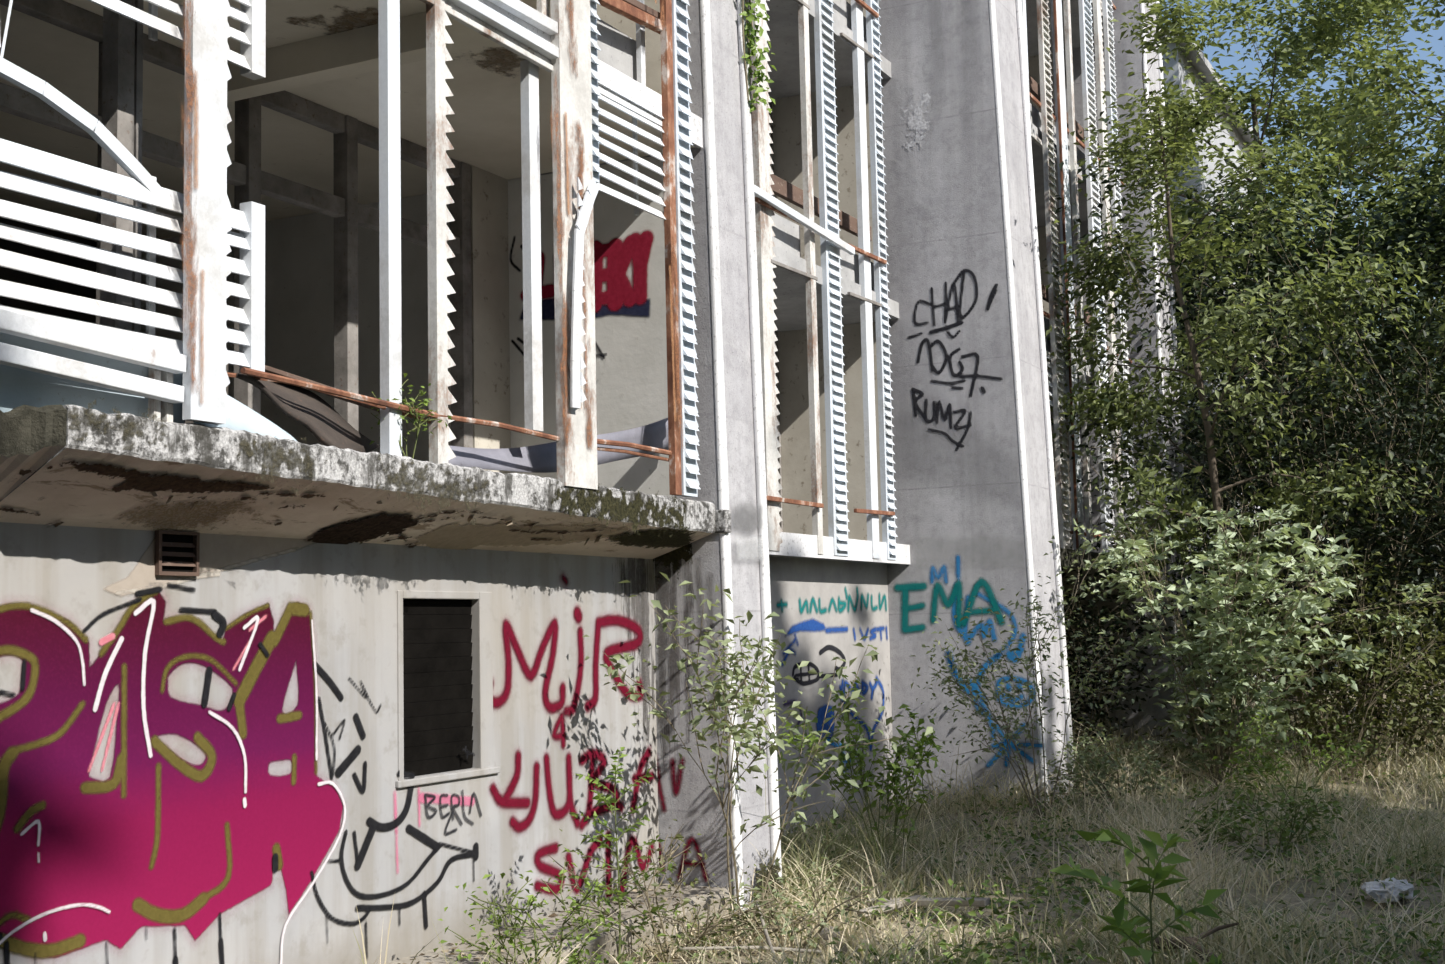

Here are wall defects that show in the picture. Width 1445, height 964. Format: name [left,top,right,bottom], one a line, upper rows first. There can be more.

rust [566,0,578,76]
rust [182,1,204,402]
rust [551,78,593,448]
rust [669,236,684,448]
leakage [613,548,713,769]